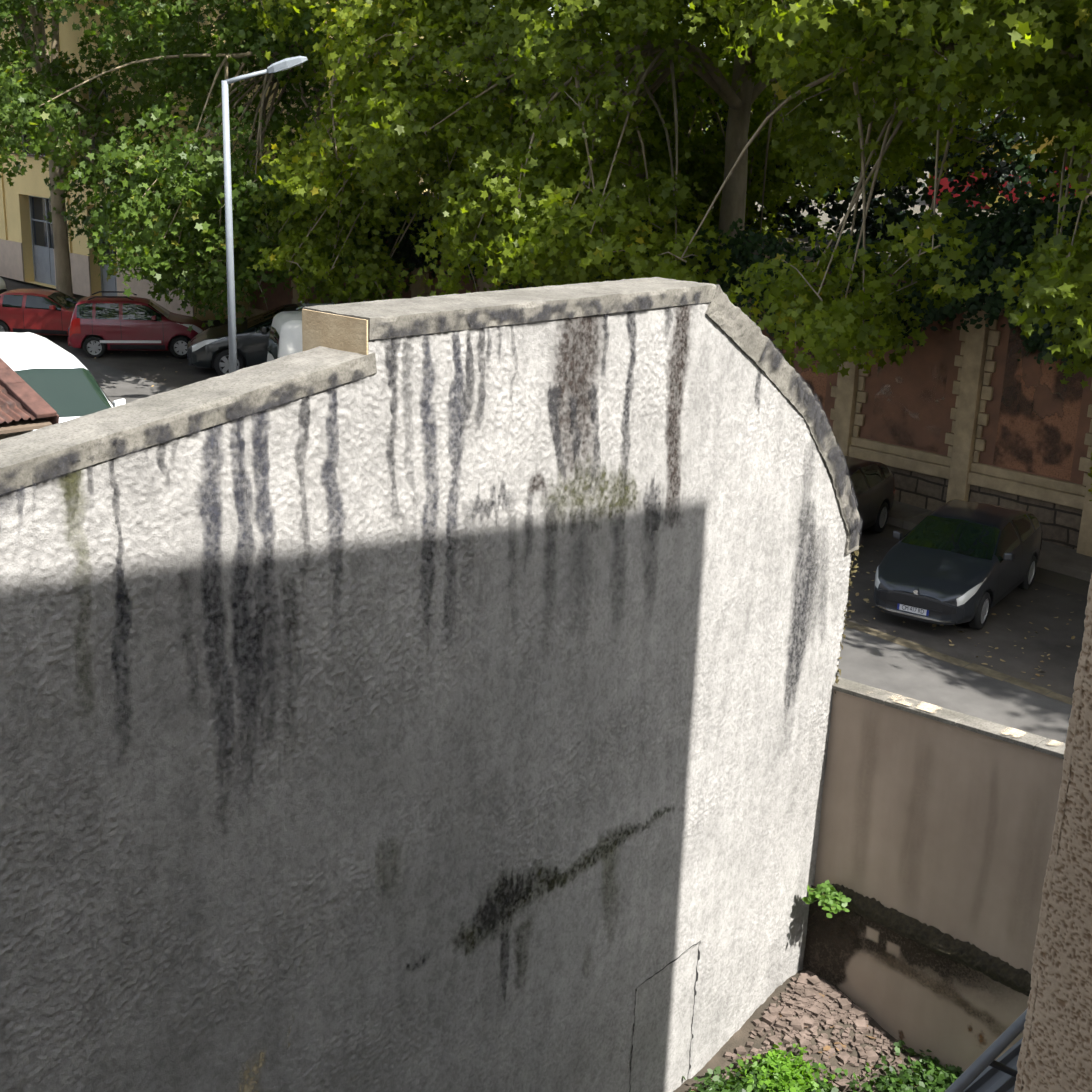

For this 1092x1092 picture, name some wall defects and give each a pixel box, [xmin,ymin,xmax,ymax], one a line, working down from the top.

leakage [297,396,310,475]
leakage [322,388,345,569]
leakage [386,338,410,488]
leakage [421,324,516,573]
leakage [548,388,580,469]
leakage [590,388,600,456]
leakage [621,311,636,498]
leakage [648,304,690,550]
leakage [200,410,296,732]
leakage [786,513,824,705]
leakage [549,807,674,888]
leakage [803,885,998,1031]